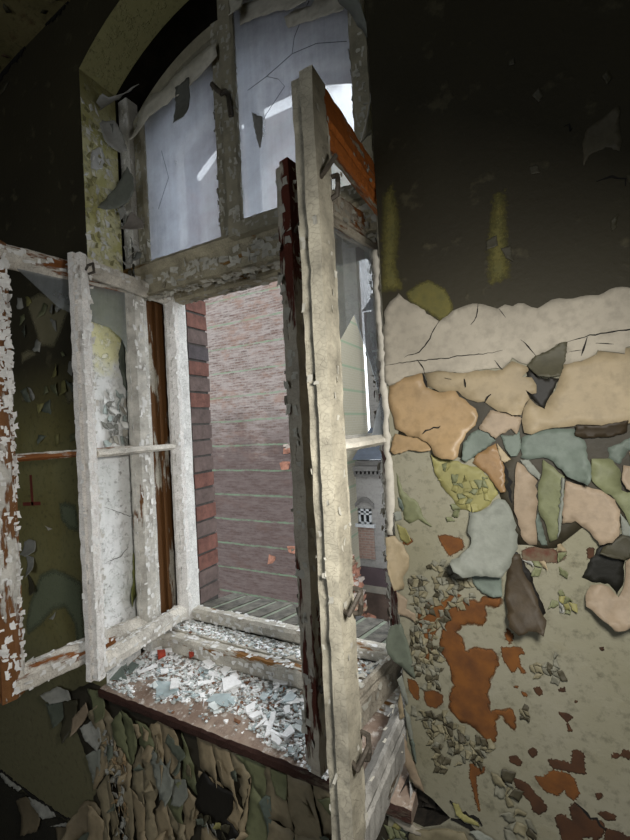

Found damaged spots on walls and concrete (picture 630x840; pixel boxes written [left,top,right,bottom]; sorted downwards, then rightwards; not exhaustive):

peeling [80,39,217,266]
crack [385,323,503,387]
crack [568,329,630,356]
flaking render [376,287,630,840]
peeling [40,683,332,840]